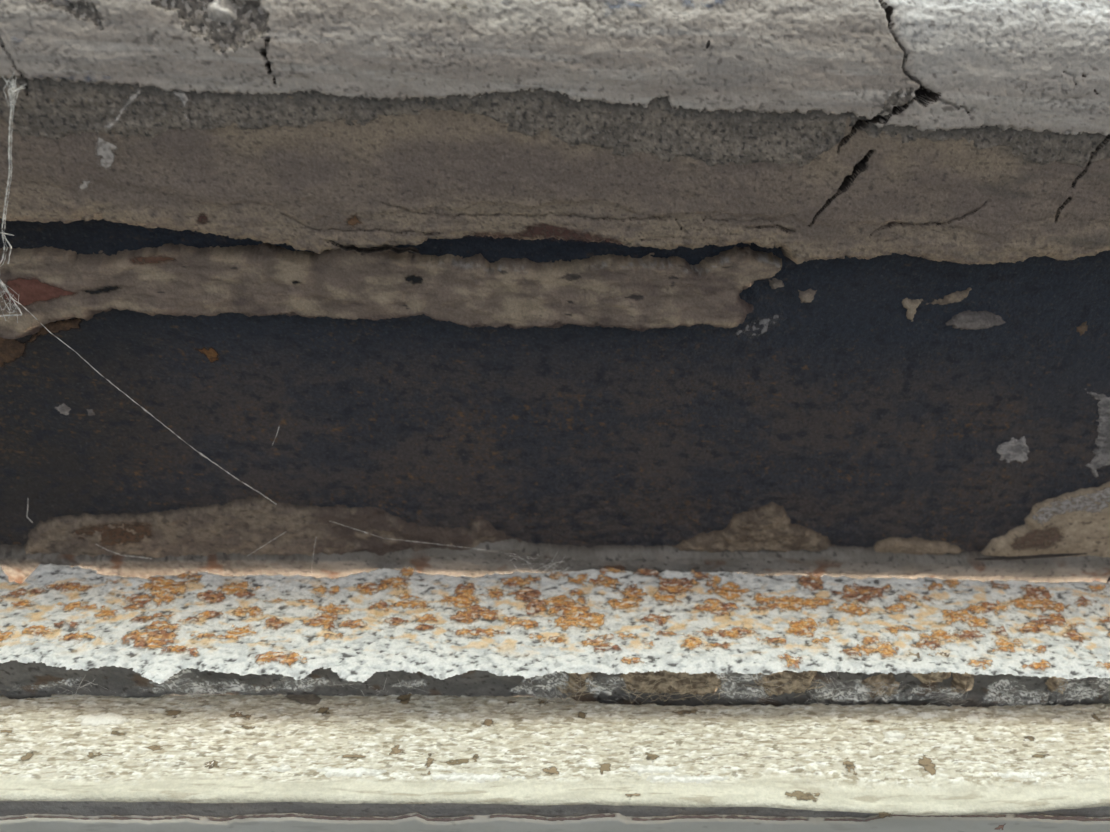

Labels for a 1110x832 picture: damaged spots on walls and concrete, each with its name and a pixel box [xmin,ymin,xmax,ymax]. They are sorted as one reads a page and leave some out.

spalling [151,0,271,54]
crack [318,0,986,254]
crack [1055,135,1110,221]
spalling [85,286,119,294]
spalling [405,275,423,284]
rust [0,567,1110,670]